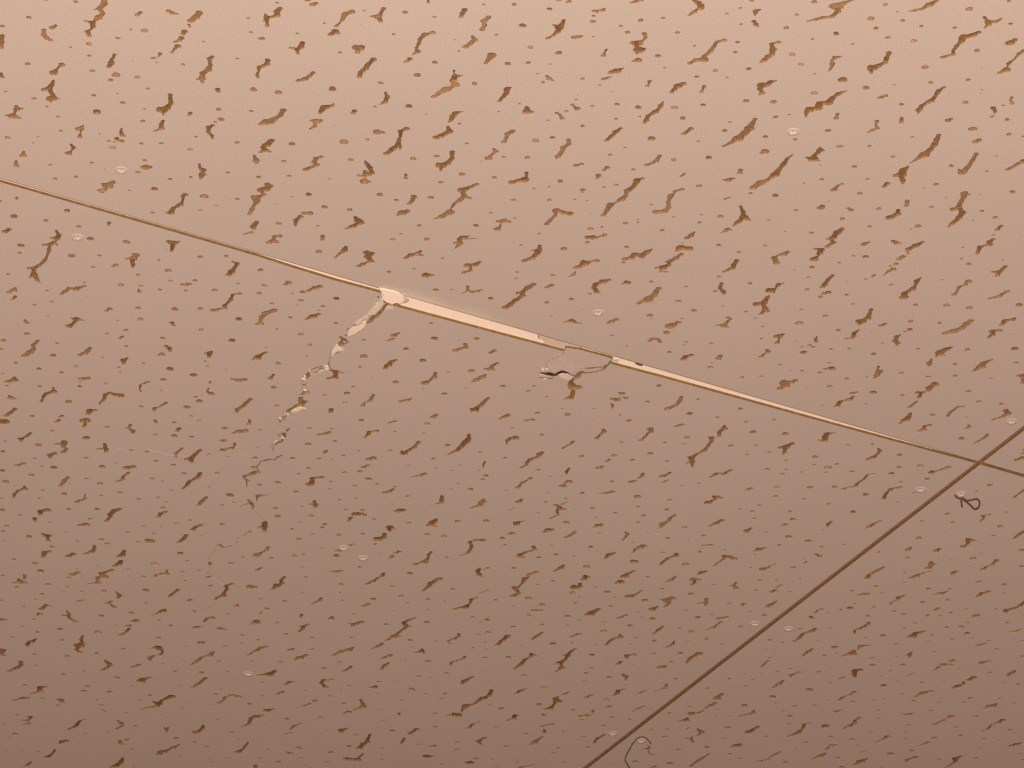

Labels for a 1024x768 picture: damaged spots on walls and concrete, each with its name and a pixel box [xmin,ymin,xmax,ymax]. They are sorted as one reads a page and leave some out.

crack [194,296,398,612]
spalling [539,348,612,390]